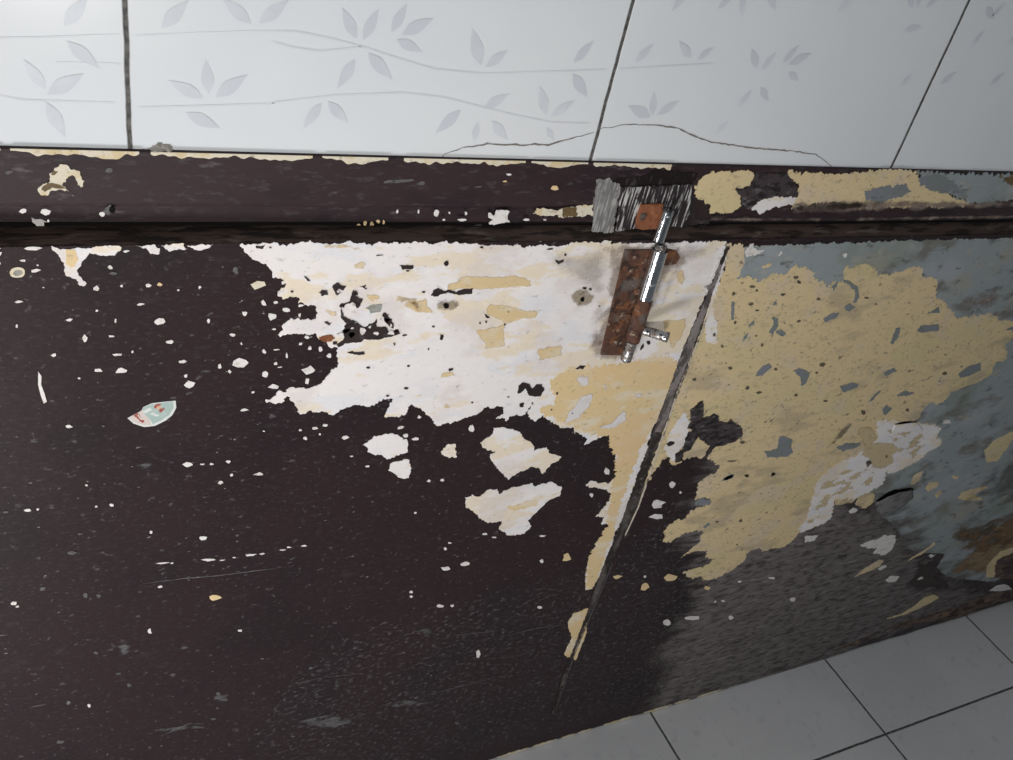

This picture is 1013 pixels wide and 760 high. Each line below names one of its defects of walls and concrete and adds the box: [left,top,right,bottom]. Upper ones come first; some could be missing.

peeling [10,148,139,196]
peeling [151,152,388,164]
crack [442,124,832,167]
peeling [19,208,51,226]
peeling [19,243,213,291]
corrosion [592,245,638,359]
peeling [38,372,47,403]
peeling [218,358,249,373]
peeling [238,158,1013,760]
corrosion [952,516,1013,573]